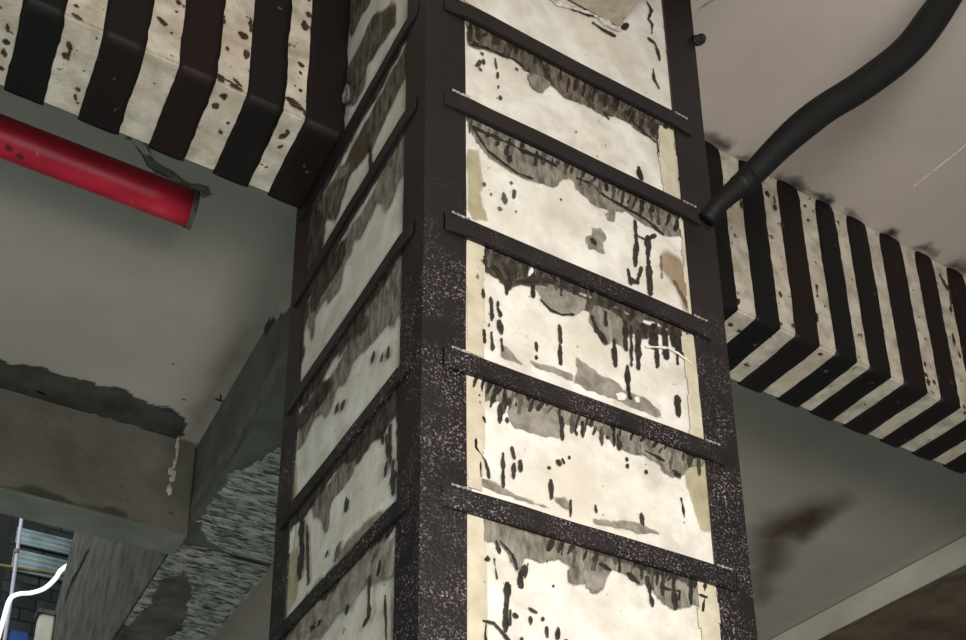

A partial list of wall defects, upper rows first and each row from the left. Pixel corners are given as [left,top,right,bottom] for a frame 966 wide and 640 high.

spalling [690,0,712,20]
peeling [466,20,675,143]
peeling [466,116,681,237]
peeling [0,360,187,438]
peeling [296,250,402,449]
peeling [481,246,693,370]
peeling [473,377,705,479]
peeling [475,515,718,612]